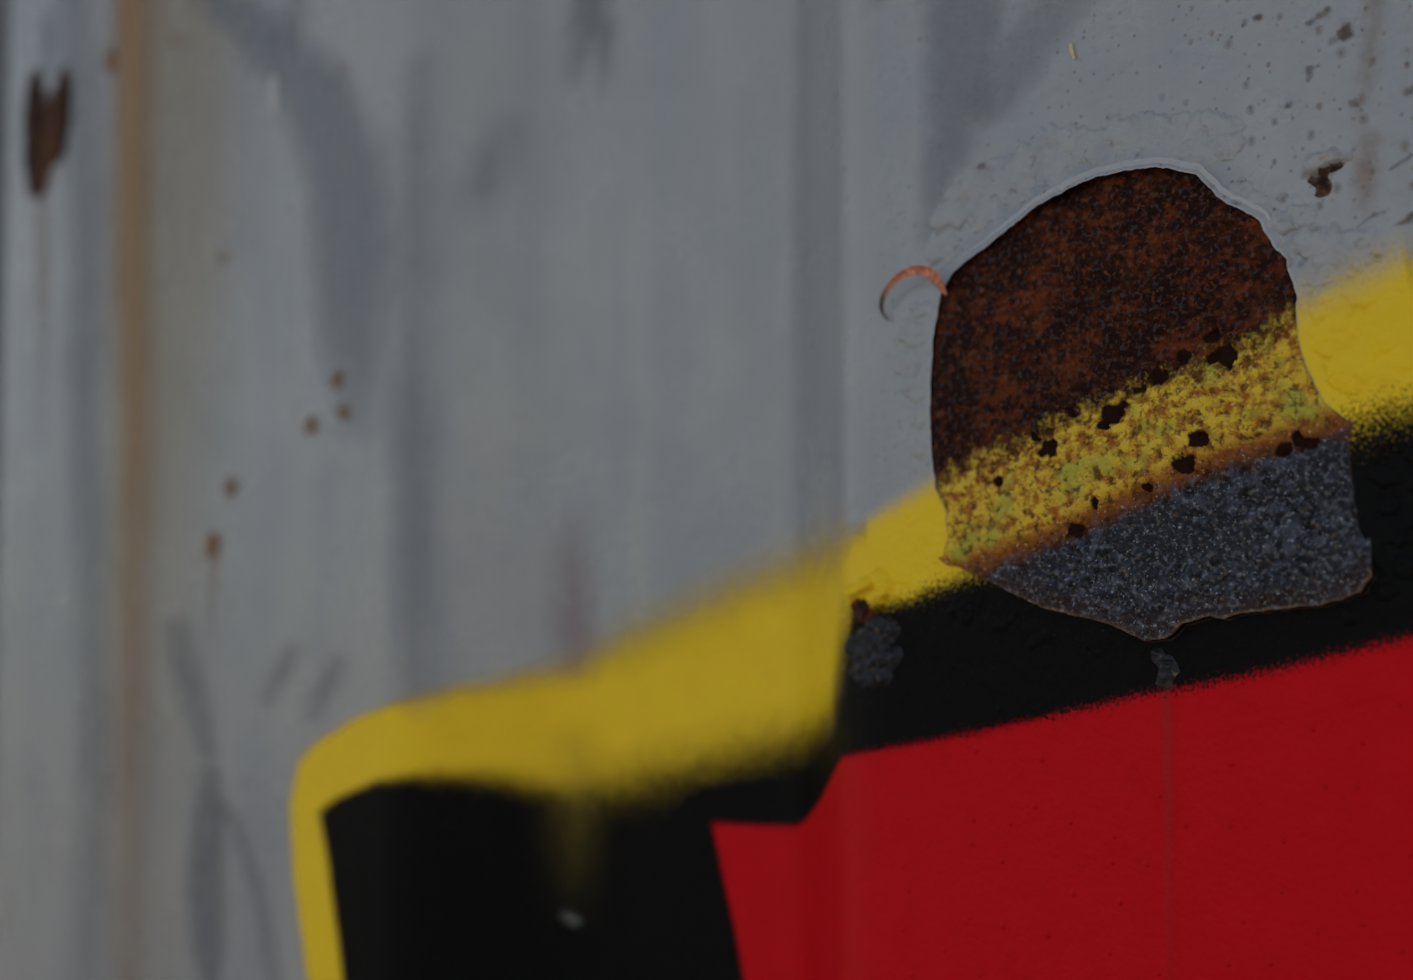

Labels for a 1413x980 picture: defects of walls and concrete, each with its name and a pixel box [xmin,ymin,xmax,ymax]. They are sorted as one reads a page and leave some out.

peeling [842,52,1413,756]